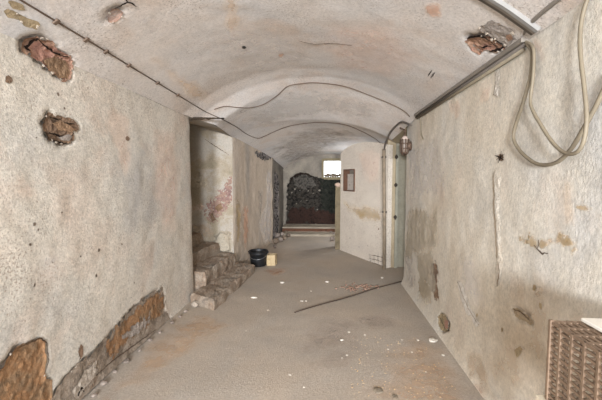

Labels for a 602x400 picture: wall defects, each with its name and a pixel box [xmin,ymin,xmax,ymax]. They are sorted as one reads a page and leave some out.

spalling [0,286,172,400]